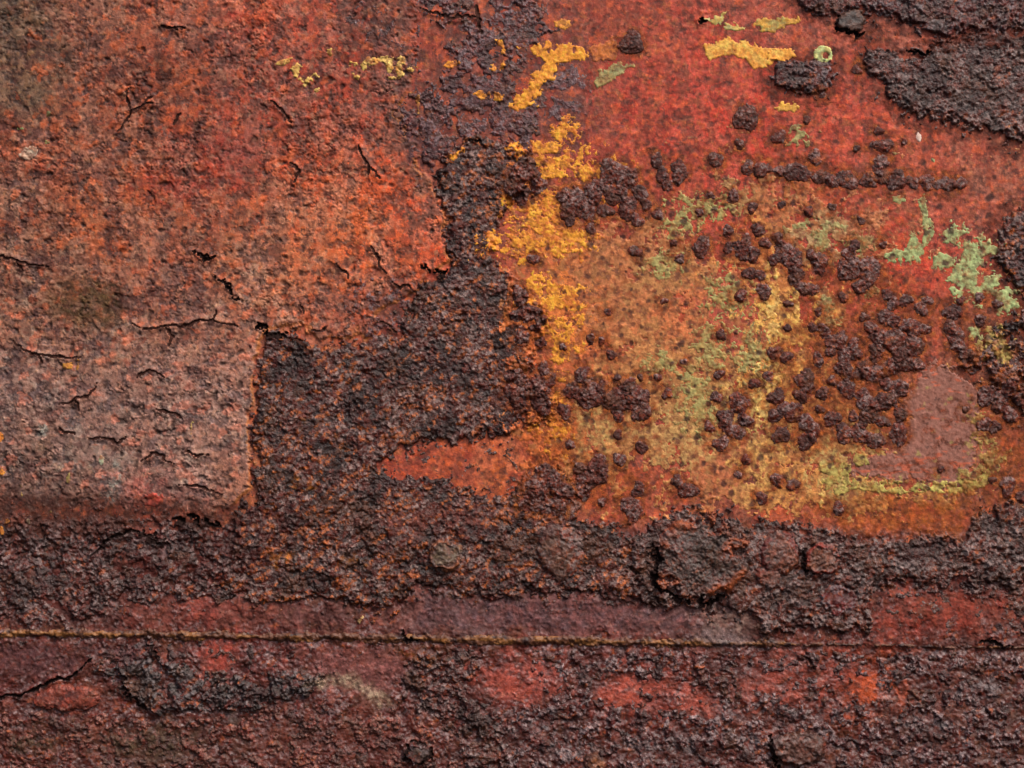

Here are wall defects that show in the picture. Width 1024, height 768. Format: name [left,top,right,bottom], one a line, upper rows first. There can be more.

crack [117,88,154,132]
peeling [473,18,635,112]
corrosion [554,154,663,237]
corrosion [700,103,968,200]
corrosion [759,0,1024,160]
crack [58,382,127,445]
crack [136,369,165,378]
crack [131,249,327,357]
peeling [468,114,1024,522]
corrosion [719,199,1024,457]
crack [0,658,92,700]
corrosion [0,635,1024,768]